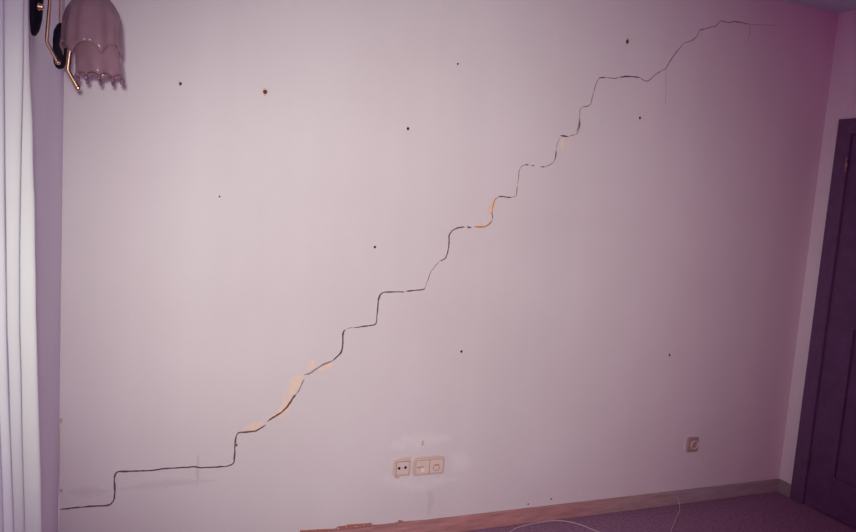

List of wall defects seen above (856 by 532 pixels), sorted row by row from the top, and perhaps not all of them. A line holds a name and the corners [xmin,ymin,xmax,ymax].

flaking render [241,359,335,433]
crack [60,20,776,510]